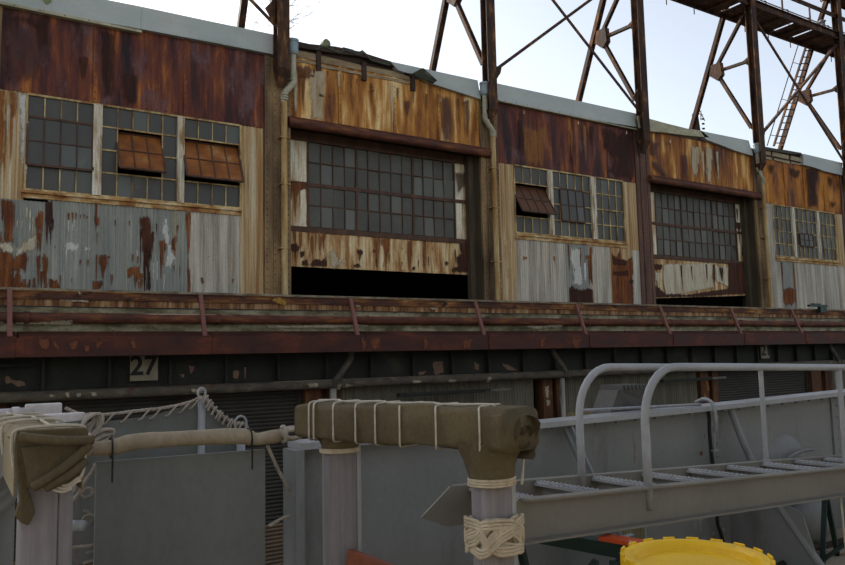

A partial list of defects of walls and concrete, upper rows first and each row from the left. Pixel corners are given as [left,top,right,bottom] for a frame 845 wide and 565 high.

rust [102,31,115,96]
rust [124,73,137,103]
rust [296,65,315,104]
rust [425,93,470,141]
rust [583,125,634,180]
rust [792,168,818,206]
rust [0,199,61,288]
rust [127,213,191,292]
rust [0,238,845,318]
peeling [570,248,587,286]
peeling [655,263,728,294]
rust [655,208,745,298]